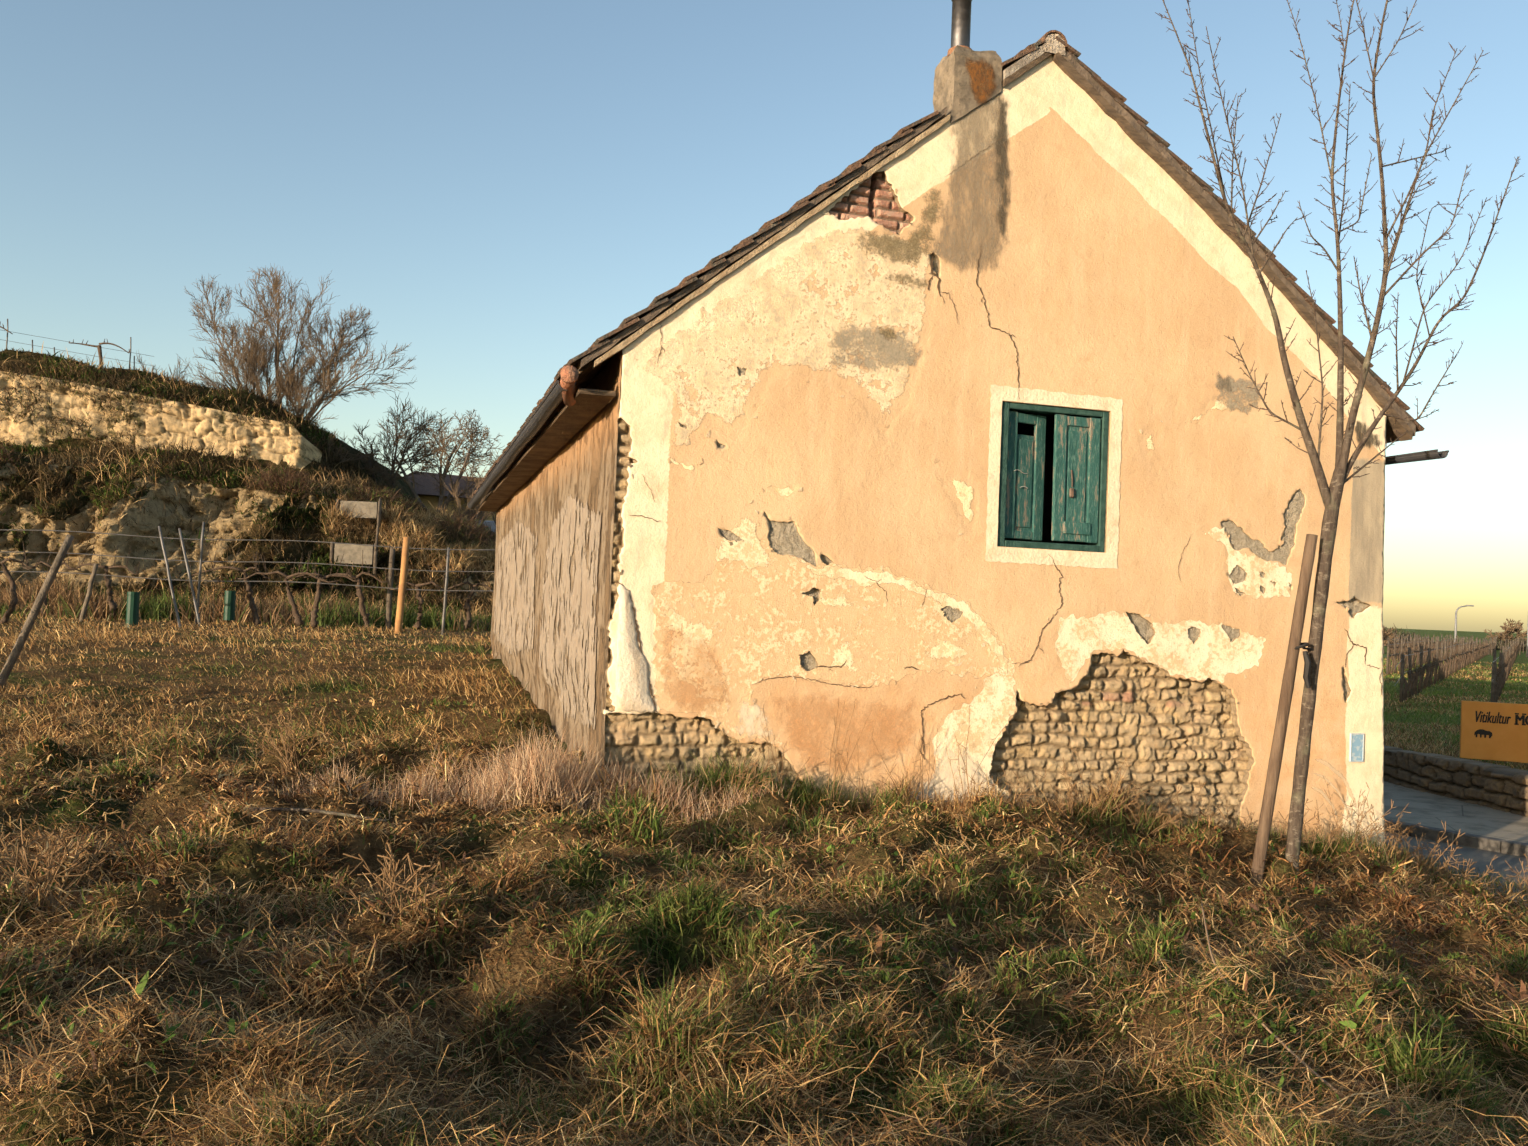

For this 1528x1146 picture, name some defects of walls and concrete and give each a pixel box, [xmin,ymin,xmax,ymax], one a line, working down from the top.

leakage [860,93,1010,286]
peeling [635,172,938,470]
leakage [833,325,920,370]
crack [928,246,1020,399]
peeling [493,418,1266,834]
peeling [1204,489,1304,599]
spalling [1337,598,1368,617]